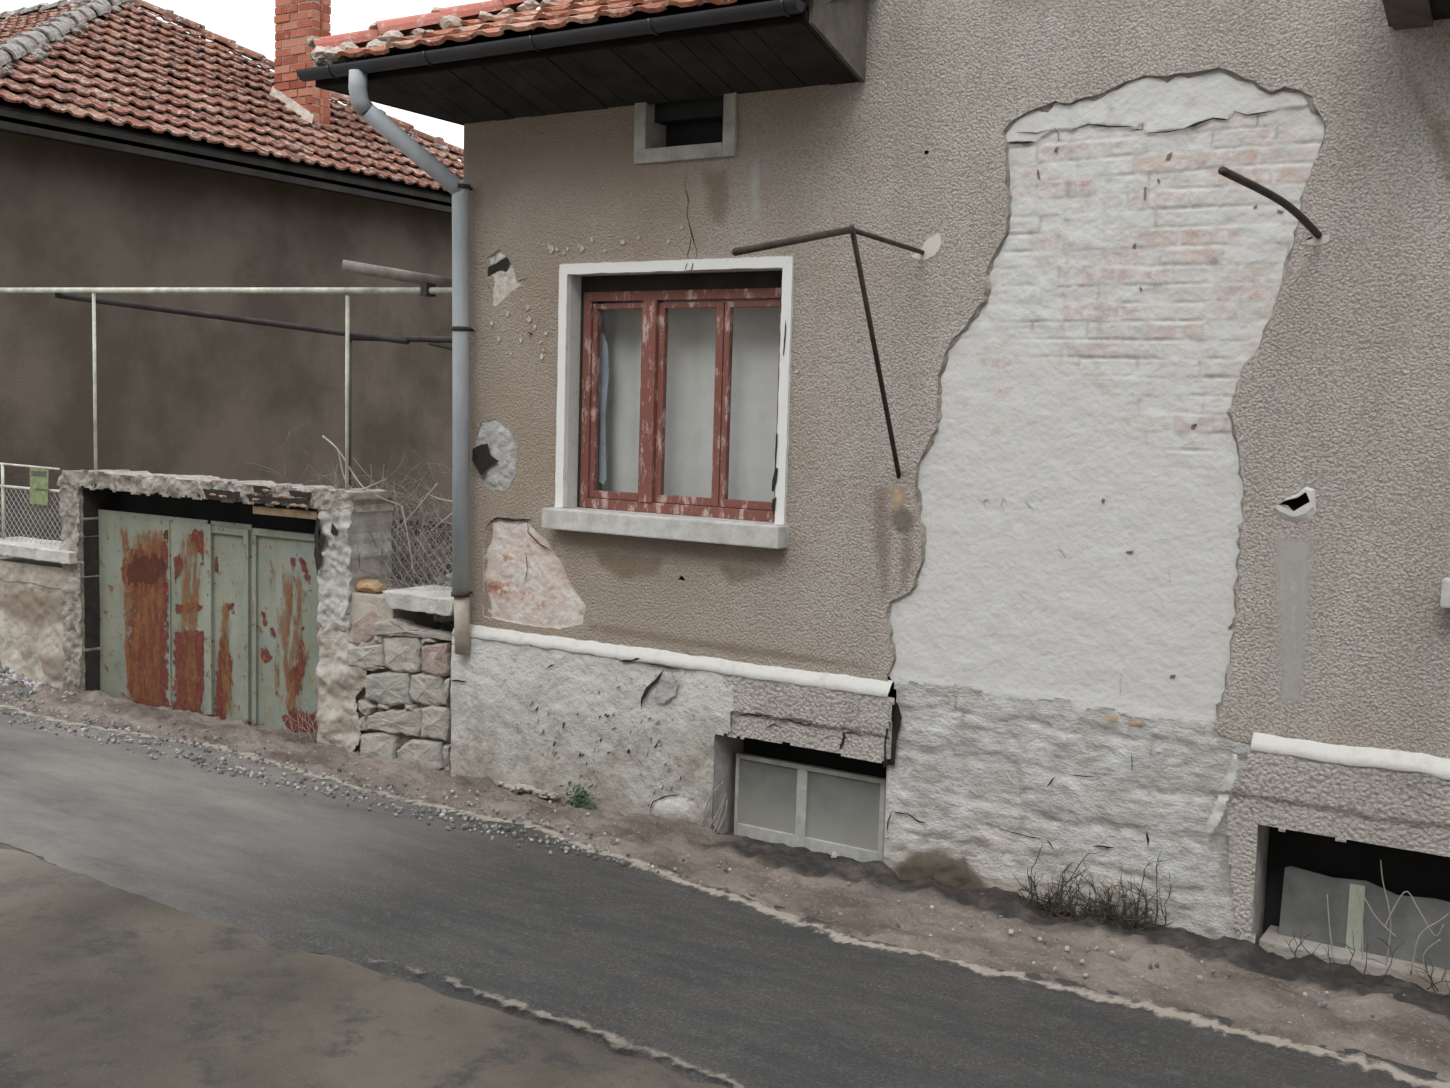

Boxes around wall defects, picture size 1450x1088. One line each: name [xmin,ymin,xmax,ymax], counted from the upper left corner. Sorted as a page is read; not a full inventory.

flaking render [486,249,547,359]
crack [685,177,697,277]
rust [121,528,234,720]
rust [261,557,318,735]
flaking render [482,517,586,629]
flaking render [883,67,1331,944]